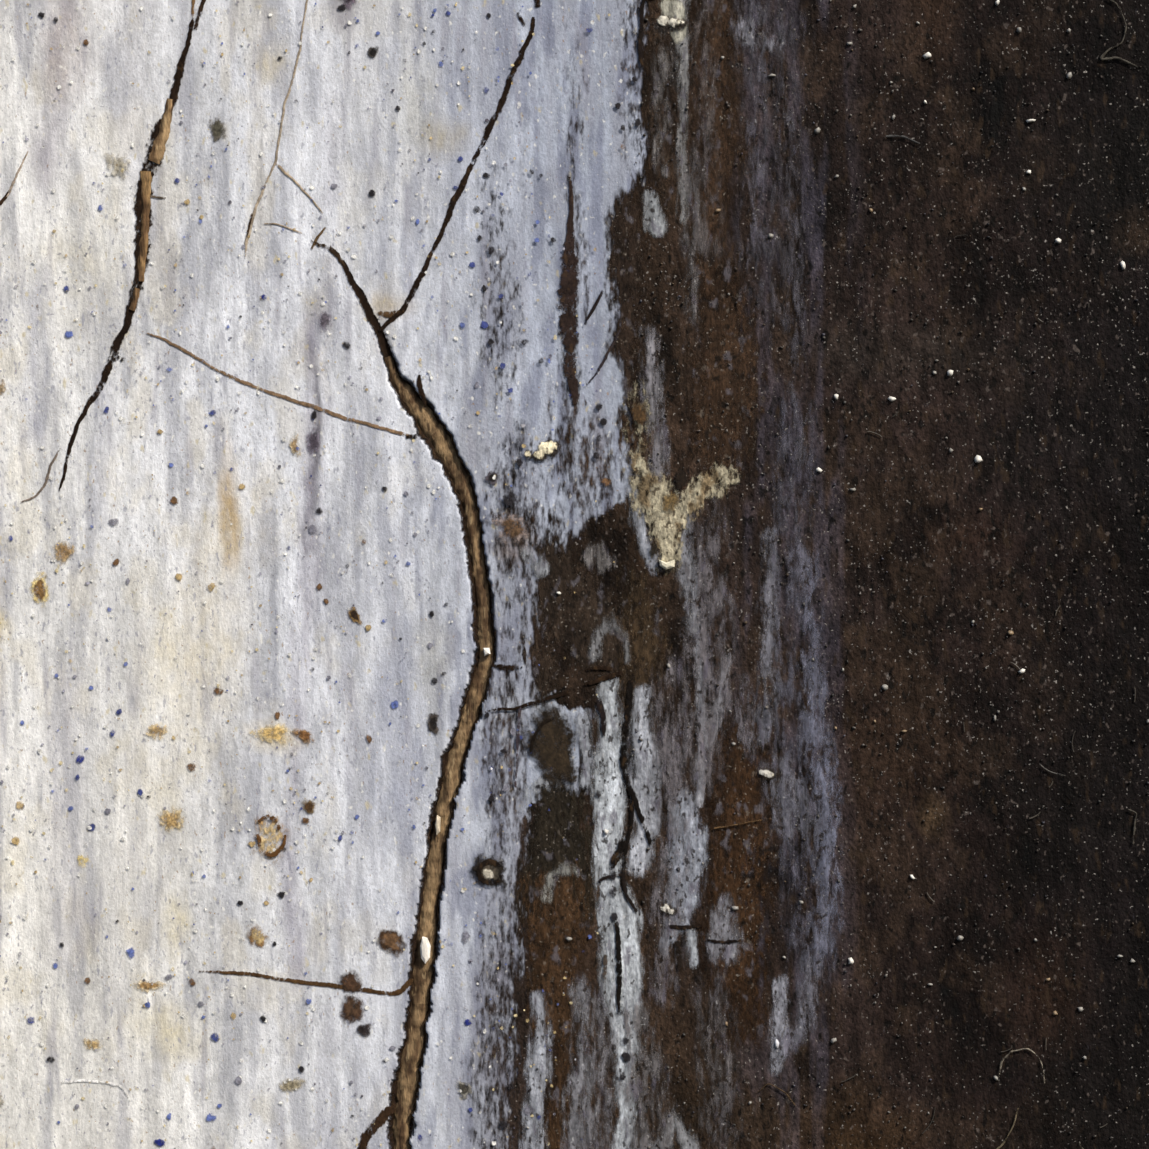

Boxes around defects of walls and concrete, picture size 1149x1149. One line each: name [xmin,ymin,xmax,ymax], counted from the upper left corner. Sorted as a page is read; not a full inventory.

crack [0,151,28,205]
peeling [644,191,665,237]
peeling [653,0,718,319]
peeling [735,0,803,323]
crack [21,0,652,1149]
spalling [485,471,498,485]
leakage [471,0,1149,1149]
hole [471,854,508,888]